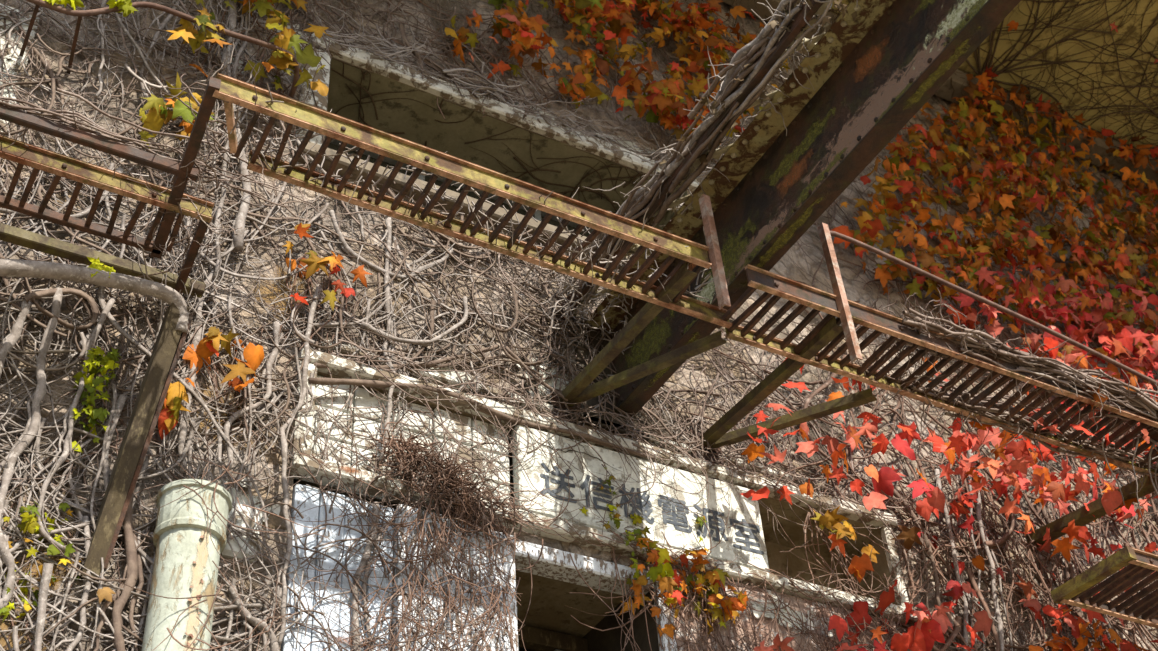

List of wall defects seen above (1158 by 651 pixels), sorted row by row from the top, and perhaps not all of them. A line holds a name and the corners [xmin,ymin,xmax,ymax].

rust [712,5,968,303]